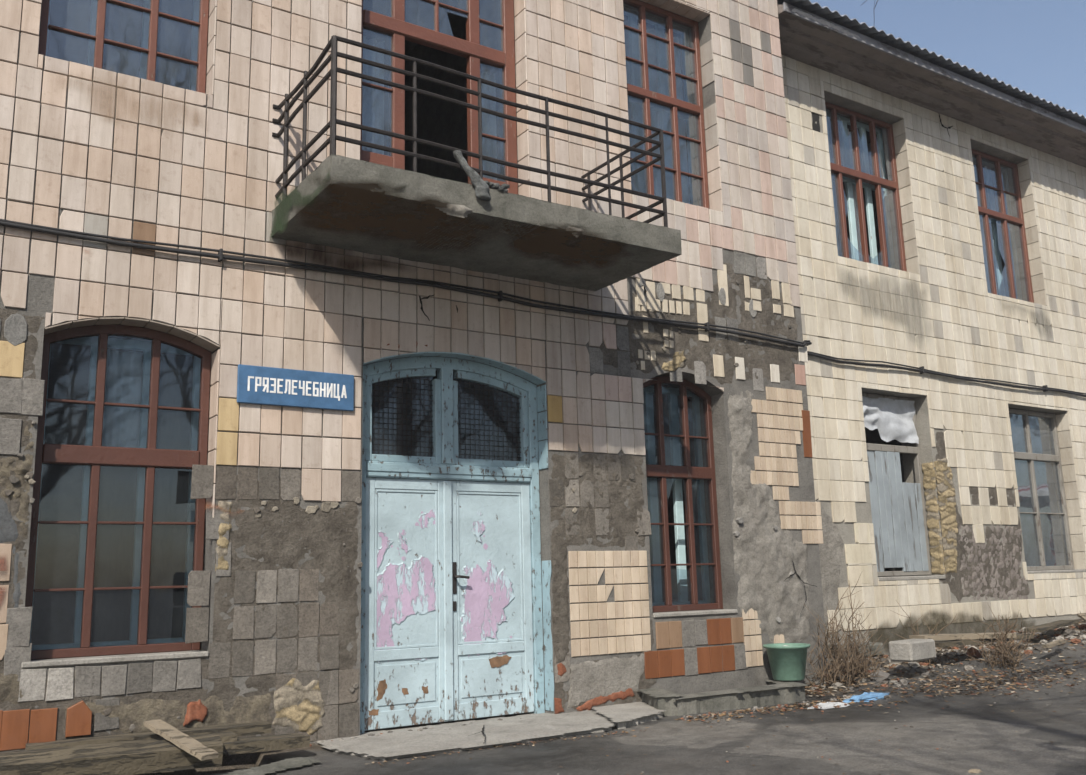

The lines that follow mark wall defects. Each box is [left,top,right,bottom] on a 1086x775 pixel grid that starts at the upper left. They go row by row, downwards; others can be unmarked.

peeling [0,308,44,379]
peeling [589,251,798,392]
spalling [0,413,36,608]
peeling [0,465,387,753]
peeling [375,509,436,663]
peeling [460,511,515,668]
peeling [921,432,1029,603]